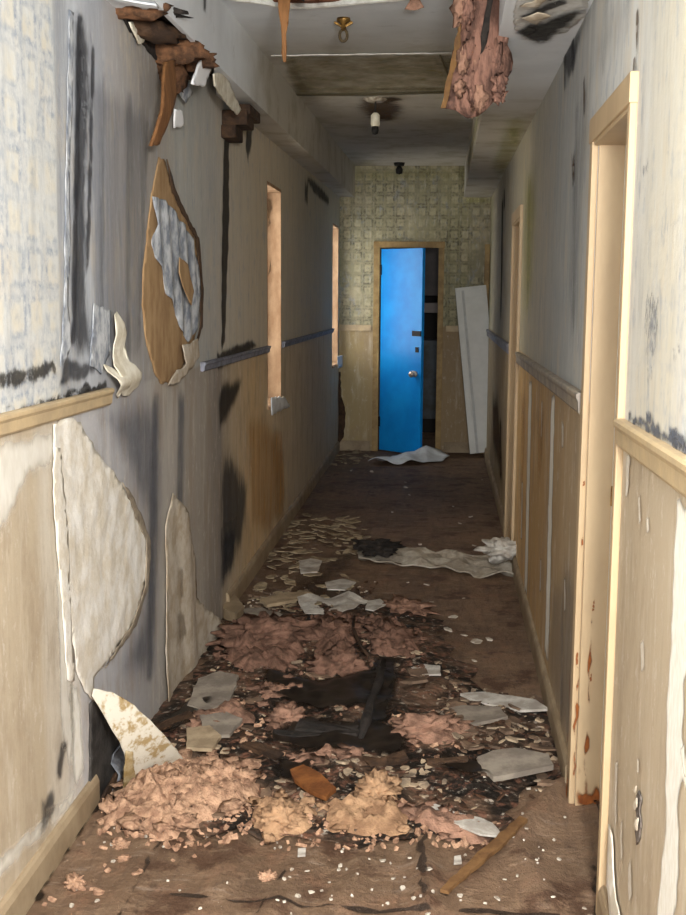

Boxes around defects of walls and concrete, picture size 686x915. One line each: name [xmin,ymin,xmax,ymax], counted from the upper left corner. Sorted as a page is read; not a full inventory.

peeling [513,0,589,35]
spalling [114,0,241,146]
leakage [72,16,95,349]
peeling [179,257,194,305]
leakage [0,359,107,403]
peeling [103,364,132,398]
leakage [629,412,686,454]
peeling [0,418,151,812]
peeling [607,763,632,915]
spalling [632,786,642,845]